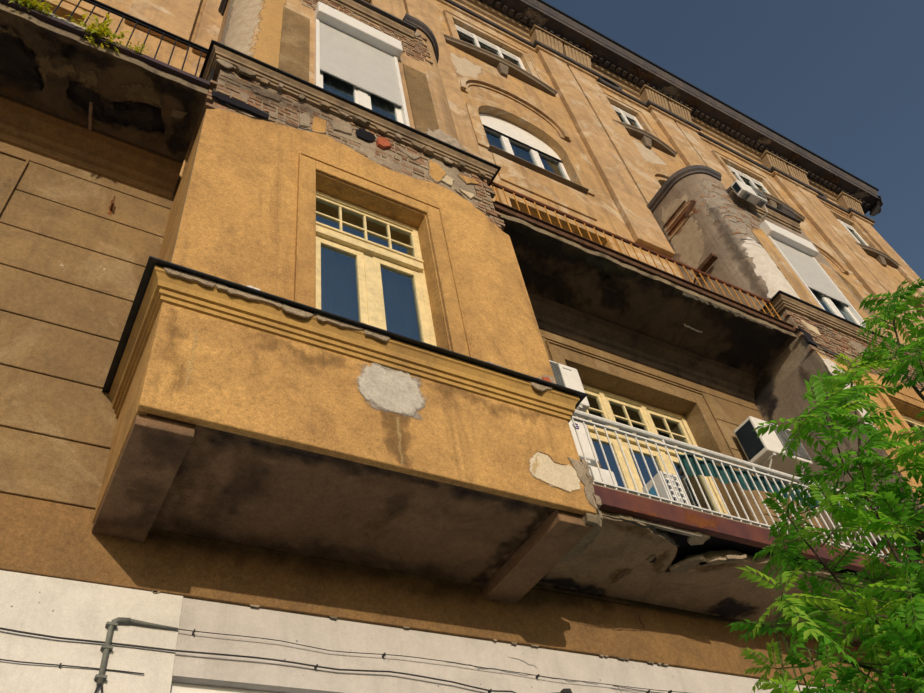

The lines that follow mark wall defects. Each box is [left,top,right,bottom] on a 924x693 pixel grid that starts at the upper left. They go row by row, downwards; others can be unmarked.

spalling [0,24,187,134]
flaking render [221,0,262,55]
flaking render [301,0,433,65]
flaking render [450,53,483,78]
flaking render [204,59,508,235]
damp [505,226,652,311]
flaking render [661,194,705,281]
flaking render [742,237,800,299]
damp [660,285,789,420]
spalling [529,451,603,563]
spalling [634,518,747,574]